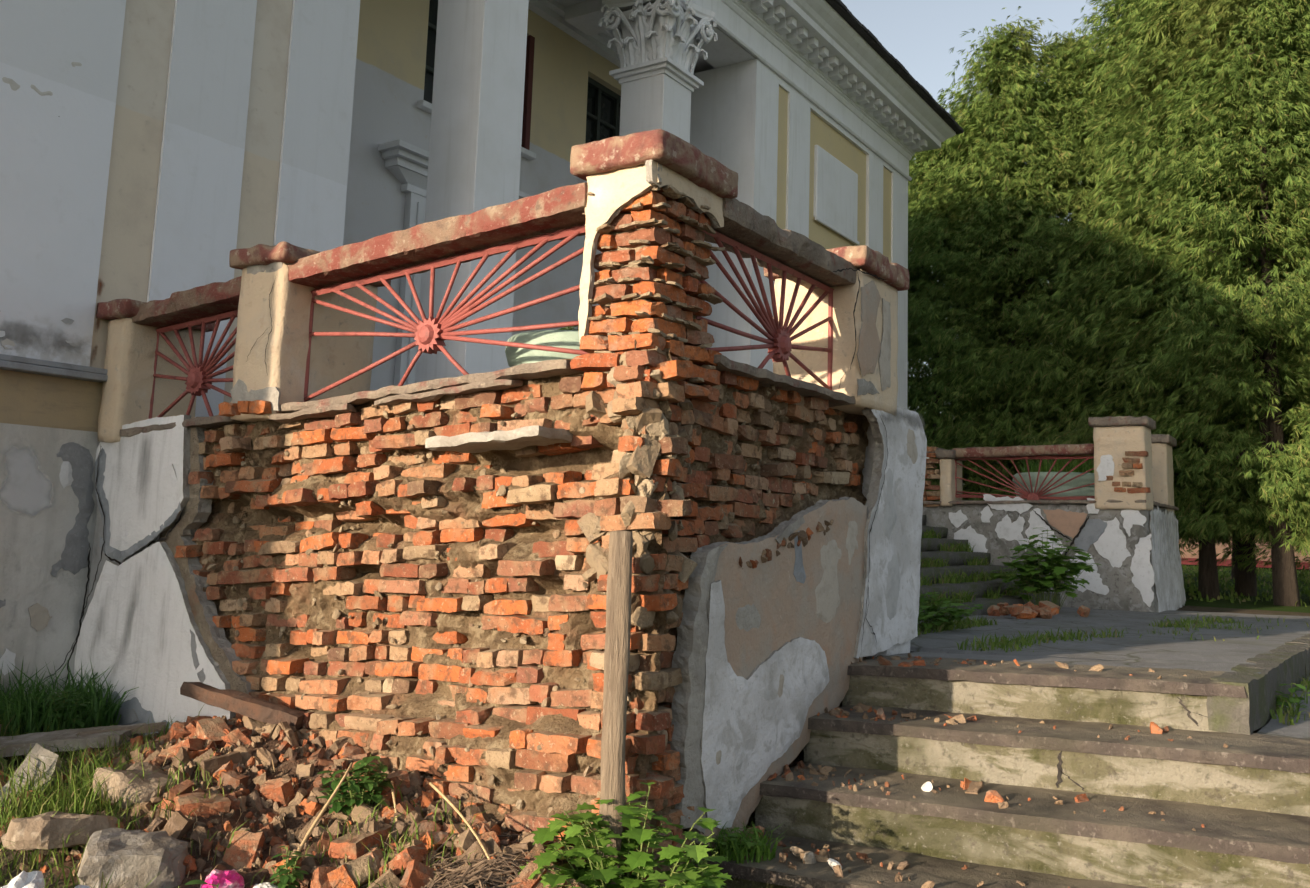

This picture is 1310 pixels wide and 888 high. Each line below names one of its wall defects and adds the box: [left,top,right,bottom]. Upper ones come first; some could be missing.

crack [247,278,276,371]
peeling [857,281,891,396]
crack [45,446,185,684]
flaking render [174,187,861,880]
peeling [815,418,900,623]
peeling [949,451,1186,612]
crack [1056,751,1086,792]